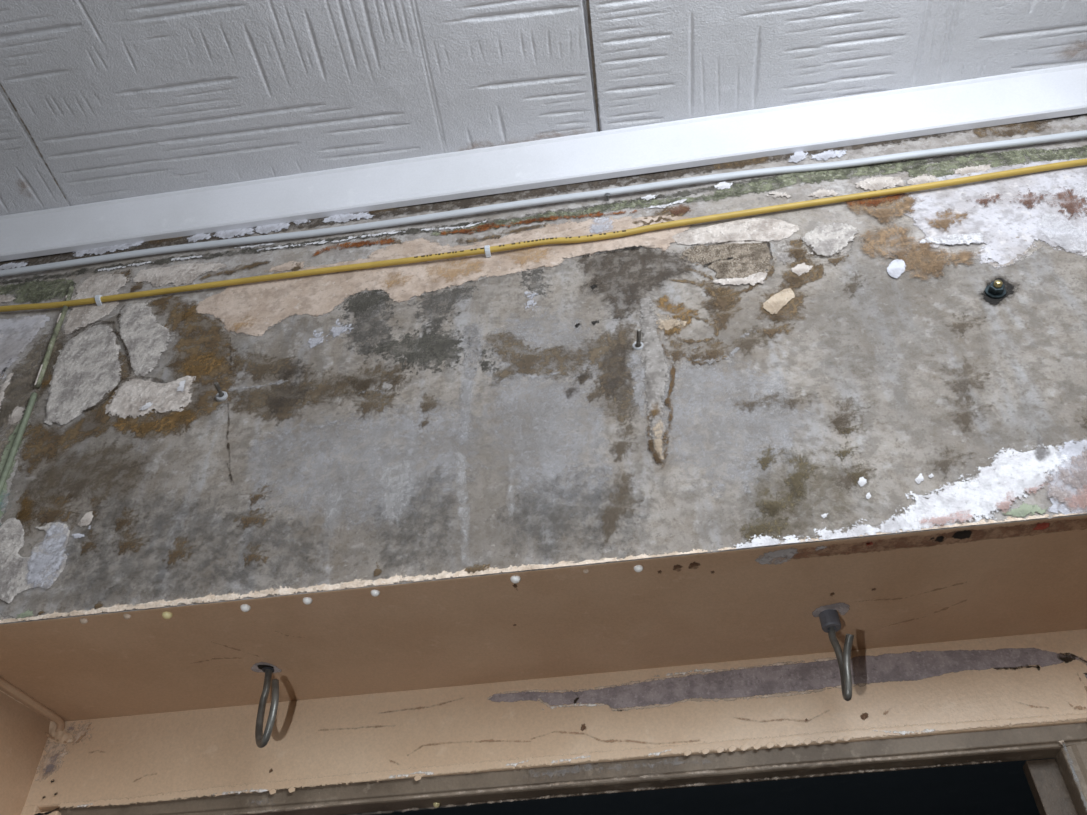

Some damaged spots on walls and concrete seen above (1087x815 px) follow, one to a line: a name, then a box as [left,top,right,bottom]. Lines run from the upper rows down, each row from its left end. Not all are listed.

damp [508,269,550,310]
damp [576,242,733,319]
crack [73,314,164,412]
crack [225,406,233,479]
damp [230,280,599,438]
spalling [0,145,1087,623]
damp [829,398,872,499]
damp [731,419,1087,550]
damp [944,364,989,431]